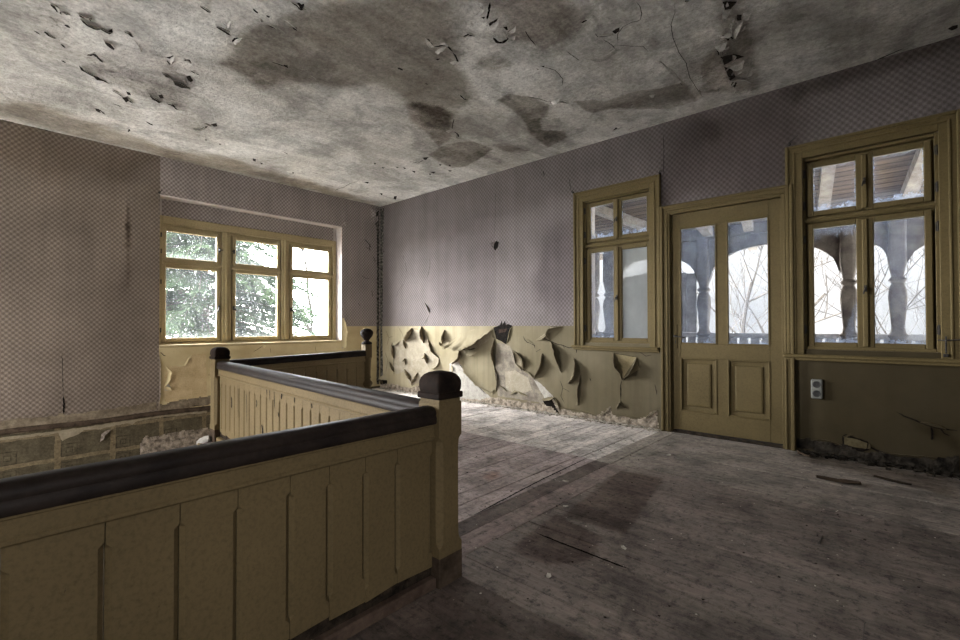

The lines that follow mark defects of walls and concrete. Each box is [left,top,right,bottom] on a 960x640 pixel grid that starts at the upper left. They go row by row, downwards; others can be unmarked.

peeling [50,3,144,52]
peeling [79,66,133,107]
peeling [162,55,199,89]
peeling [217,20,242,45]
peeling [425,38,460,65]
crack [581,4,703,97]
peeling [698,1,757,95]
crack [59,358,67,414]
peeling [158,350,207,406]
flaking render [379,320,595,415]
peeling [612,353,641,419]
spalling [140,428,209,455]